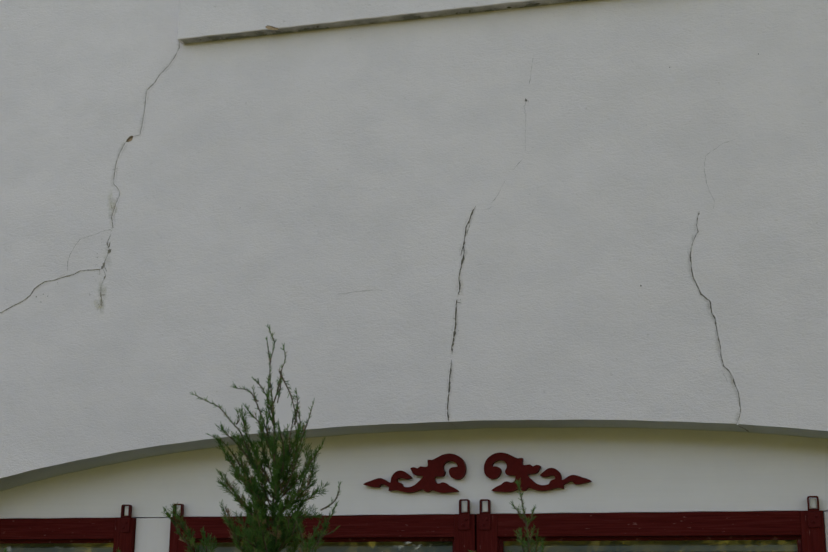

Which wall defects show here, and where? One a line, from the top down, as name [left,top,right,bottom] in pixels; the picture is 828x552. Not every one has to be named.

crack [0,32,181,313]
crack [446,193,499,427]
crack [688,141,749,432]